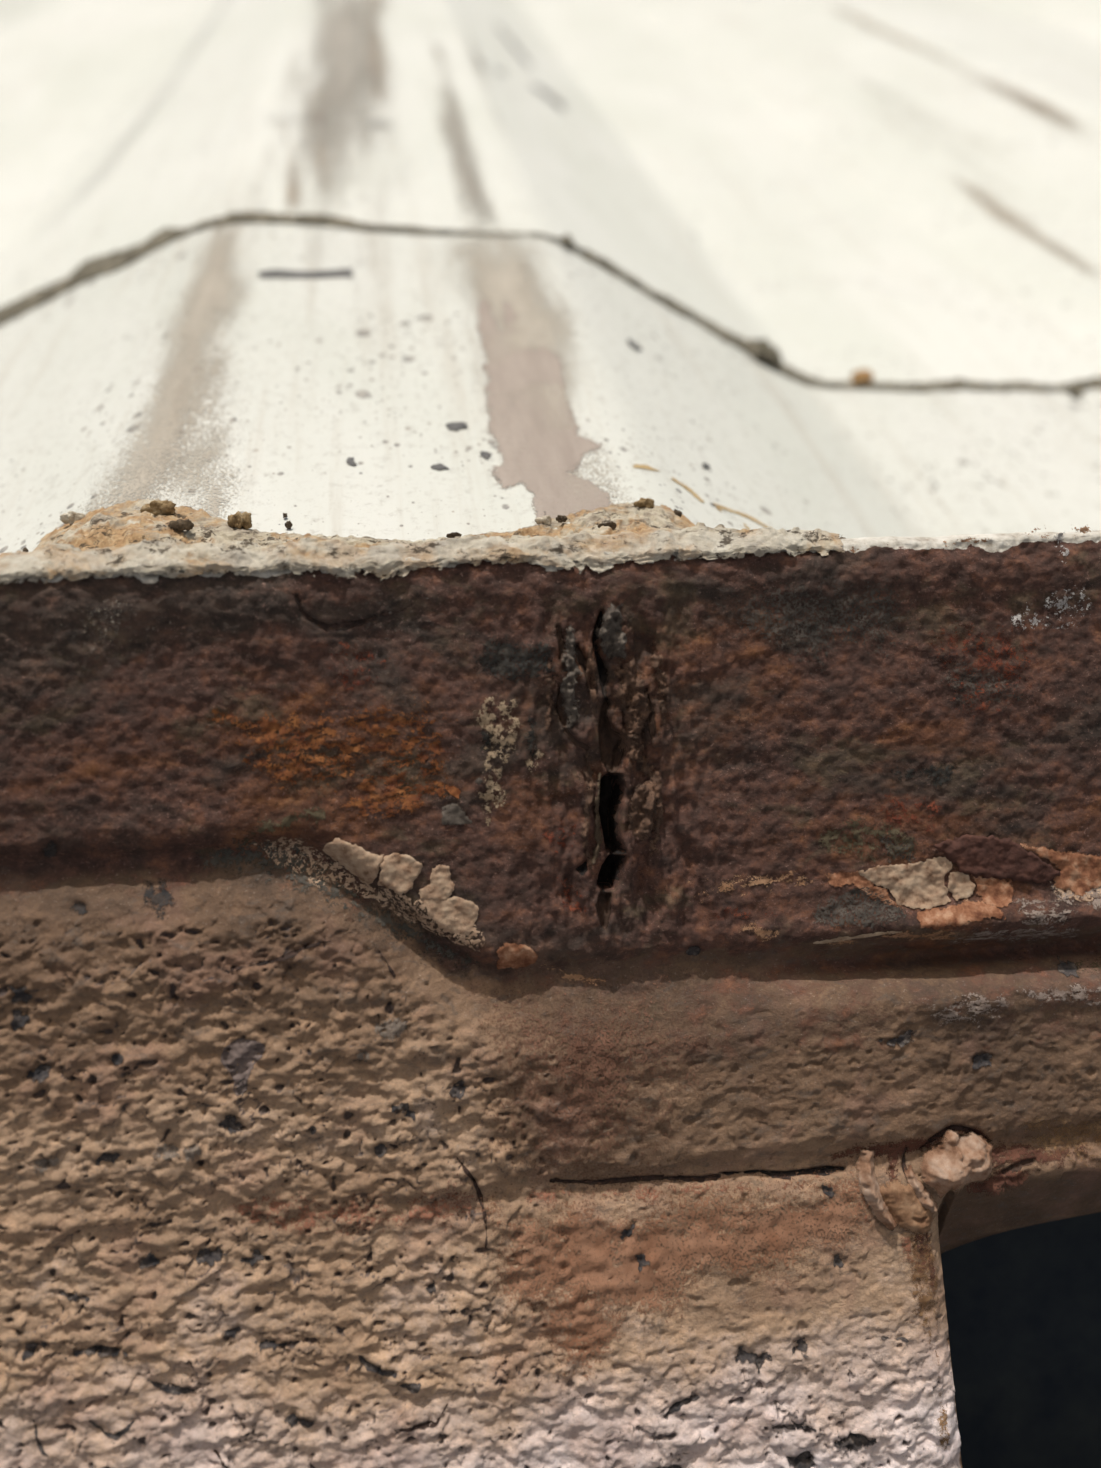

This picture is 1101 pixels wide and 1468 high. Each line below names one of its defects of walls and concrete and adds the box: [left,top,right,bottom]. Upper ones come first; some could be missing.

water stain [76,0,635,525]
rust [206,638,464,825]
crack [544,603,670,930]
peeling [254,837,538,970]
rust [684,870,813,942]
peeling [822,843,1101,1028]
crack [549,1166,844,1185]